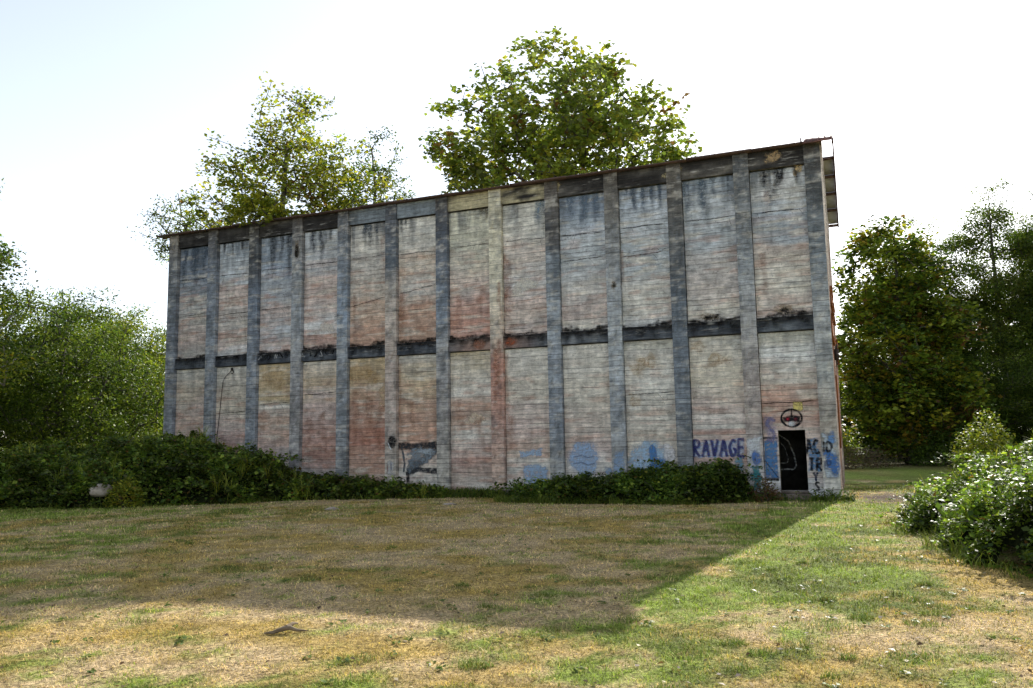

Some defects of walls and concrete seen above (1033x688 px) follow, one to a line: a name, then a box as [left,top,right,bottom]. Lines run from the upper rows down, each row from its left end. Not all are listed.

water stain [759,166,798,191]